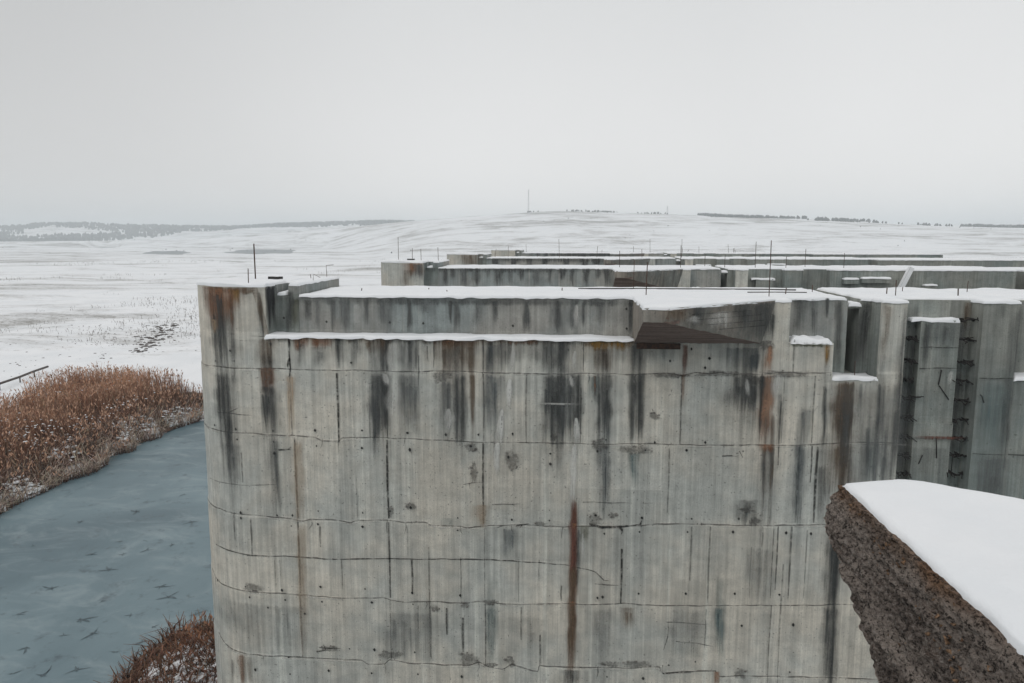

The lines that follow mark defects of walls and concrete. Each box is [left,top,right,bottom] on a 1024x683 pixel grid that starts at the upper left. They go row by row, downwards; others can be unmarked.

leakage [213,295,233,352]
leakage [365,298,512,327]
leakage [216,375,232,443]
leakage [372,340,390,438]
leakage [447,359,474,428]
leakage [523,299,581,497]
leakage [630,374,644,436]
corrosion [759,345,774,451]
spalling [896,358,924,479]
spalling [936,370,985,479]
corrosion [568,503,577,652]